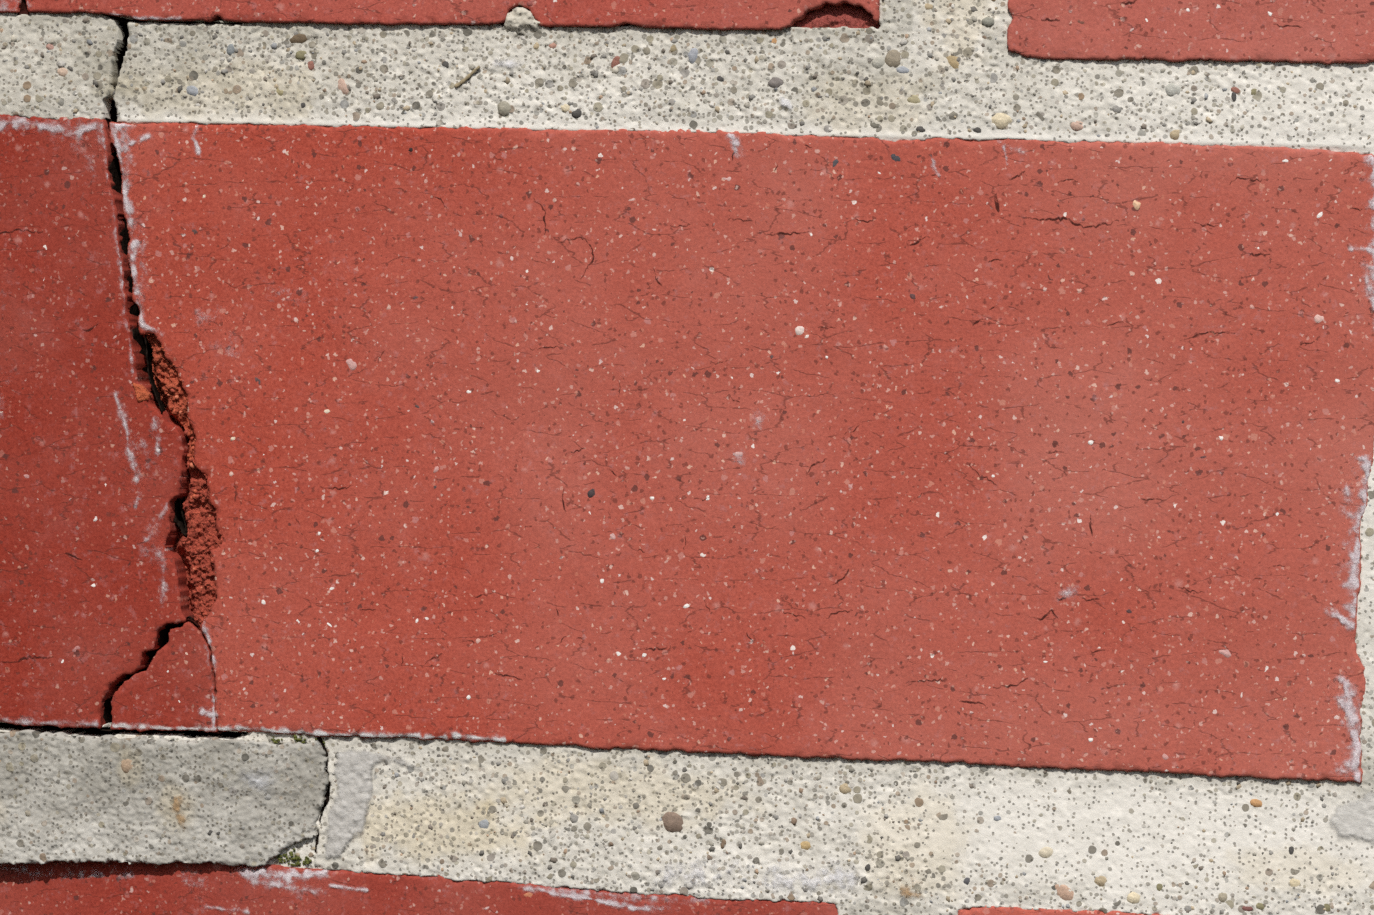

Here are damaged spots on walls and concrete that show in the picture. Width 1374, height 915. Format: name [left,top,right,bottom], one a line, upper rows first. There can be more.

spalling [793,3,880,31]
crack [104,14,243,414]
crack [174,498,188,537]
crack [100,616,201,731]
crack [314,737,331,859]